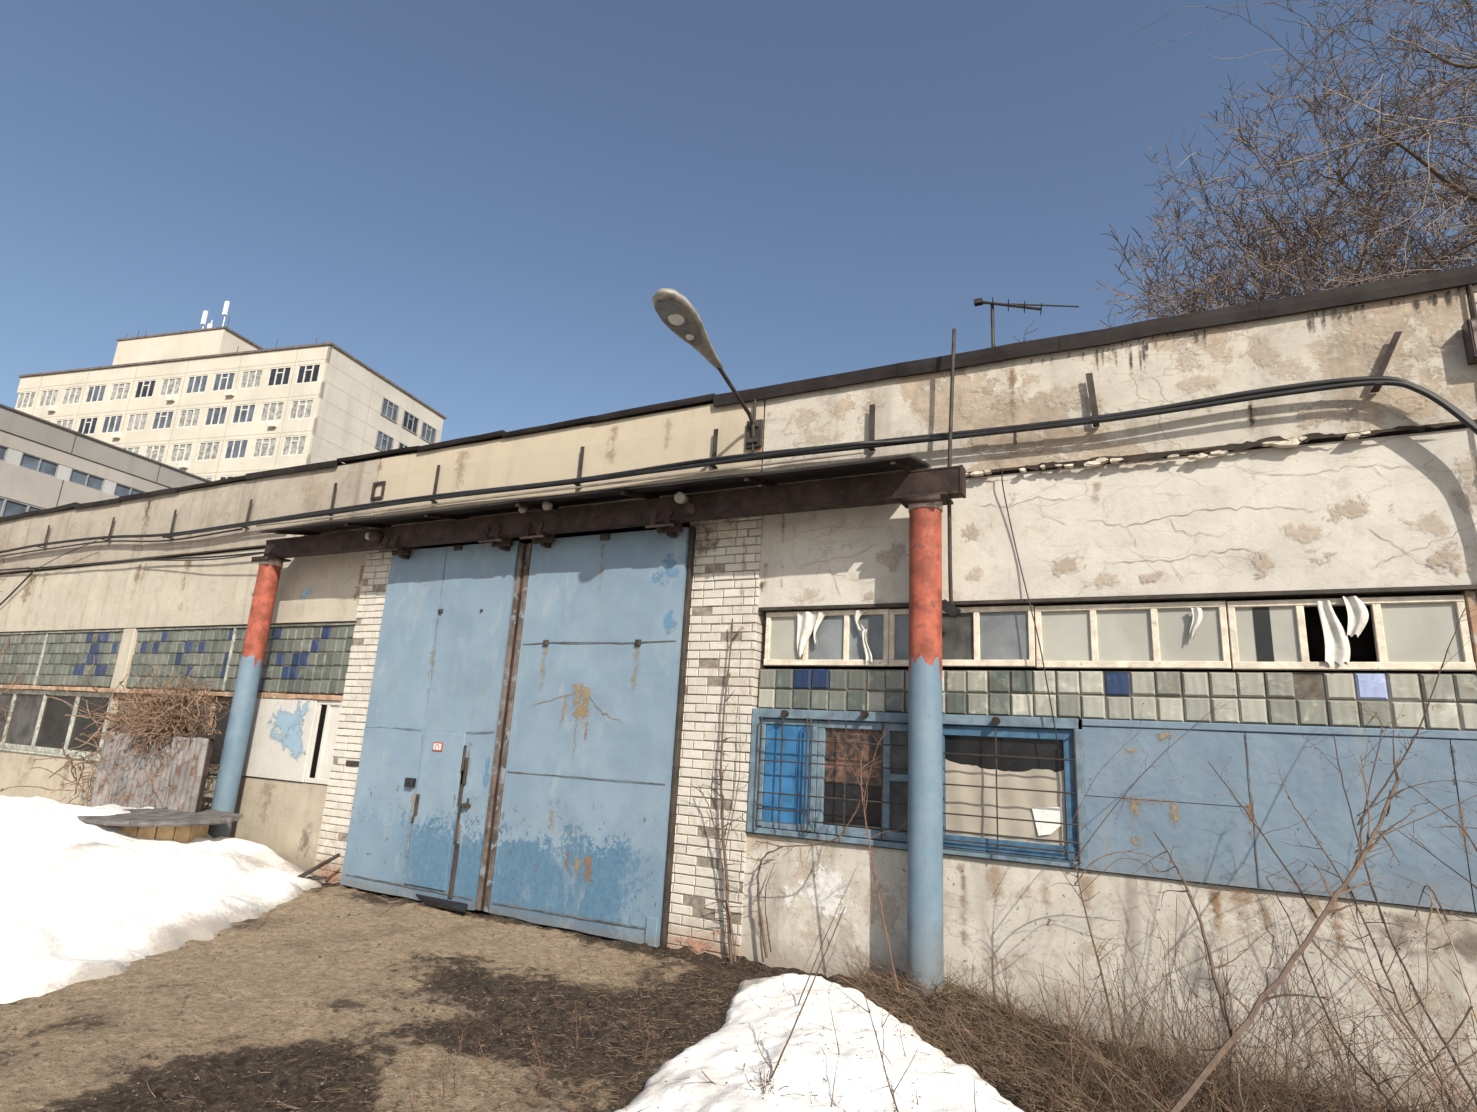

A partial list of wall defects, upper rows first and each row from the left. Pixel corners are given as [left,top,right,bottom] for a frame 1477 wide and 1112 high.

leakage [1308,305,1365,332]
leakage [1390,287,1460,308]
leakage [1031,330,1207,368]
peeling [966,396,1450,477]
peeling [962,522,980,542]
crack [980,463,1477,581]
peeling [1391,503,1473,575]
peeling [268,699,309,761]
corrosion [559,684,590,735]